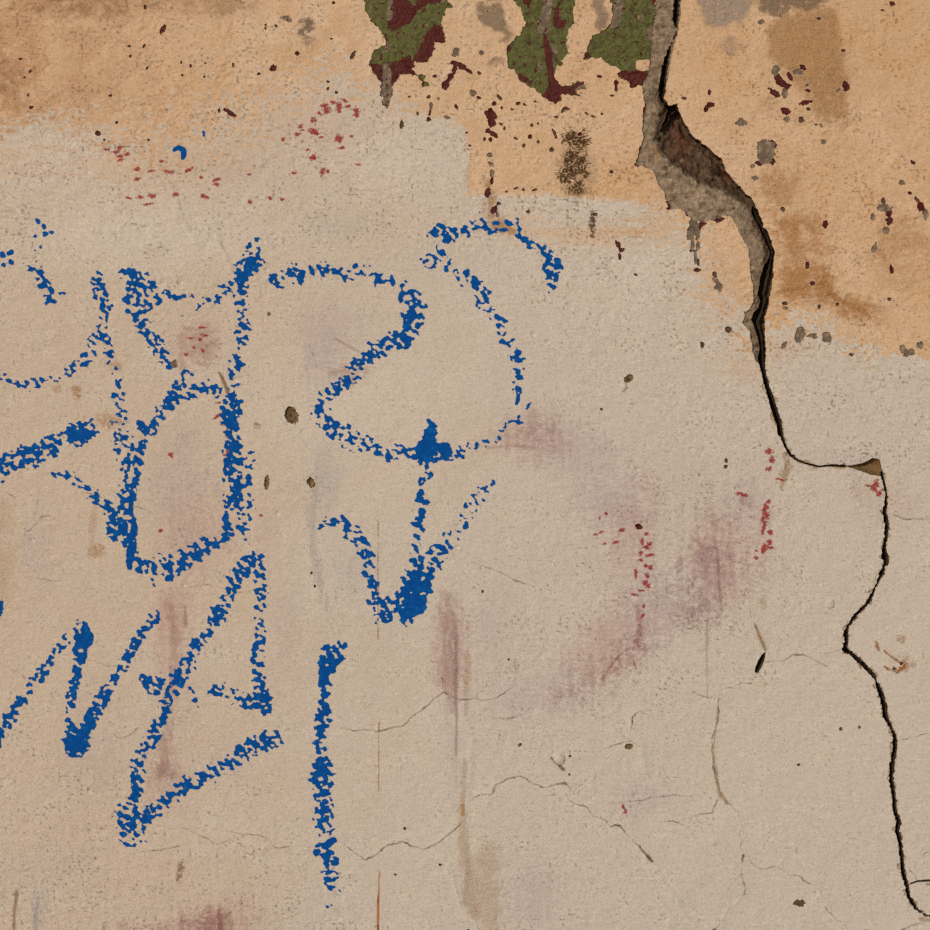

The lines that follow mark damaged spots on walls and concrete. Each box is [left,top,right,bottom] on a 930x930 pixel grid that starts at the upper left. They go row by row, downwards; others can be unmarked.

peeling [698,0,822,25]
peeling [364,0,482,122]
peeling [478,0,586,218]
crack [658,0,680,130]
peeling [767,64,823,128]
spalling [583,0,778,367]
peeling [870,198,893,234]
peeling [898,180,929,221]
peeling [781,324,832,349]
peeling [900,341,924,357]
crack [751,205,930,918]